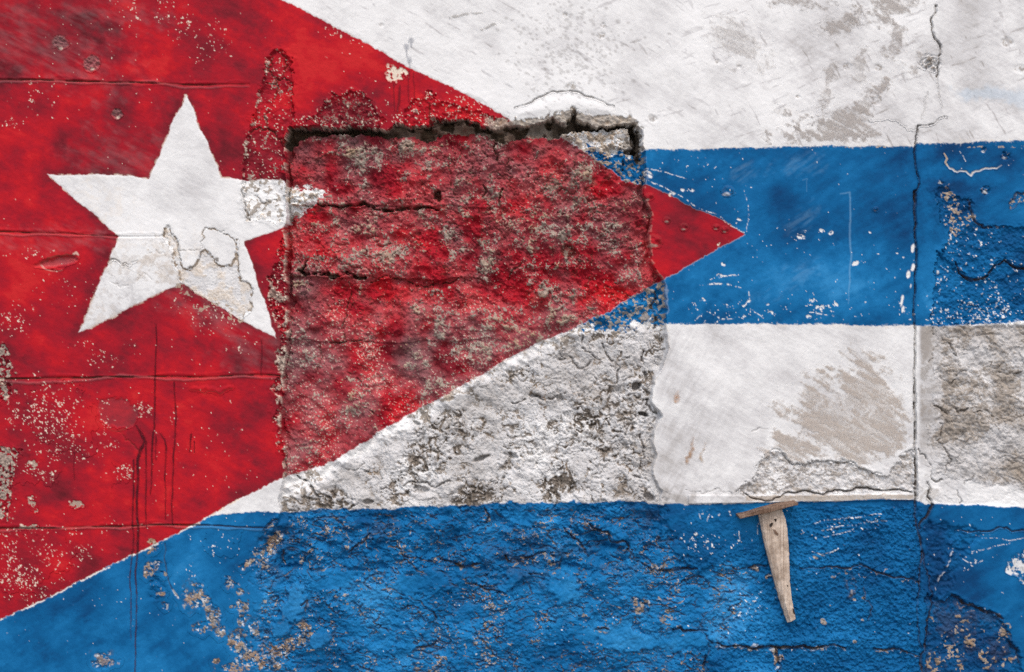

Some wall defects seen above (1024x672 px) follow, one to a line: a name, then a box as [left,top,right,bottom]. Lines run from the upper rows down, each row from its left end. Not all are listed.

spalling [240,49,646,225]
spalling [735,184,1024,496]
crack [800,4,1024,672]
spalling [139,506,773,672]